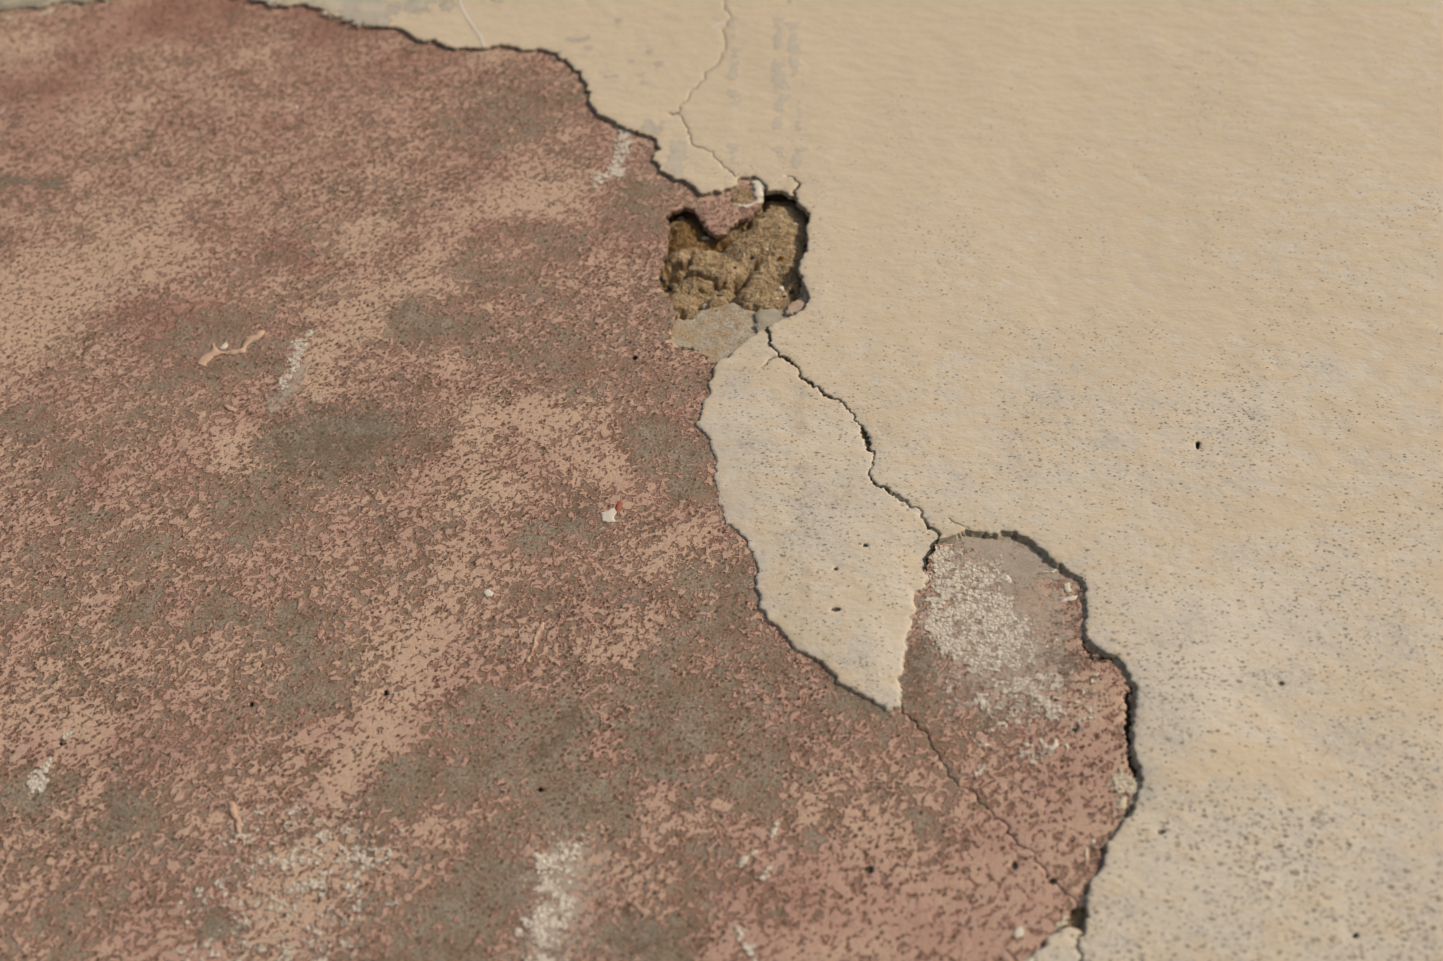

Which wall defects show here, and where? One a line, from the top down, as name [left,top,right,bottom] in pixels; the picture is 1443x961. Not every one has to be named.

flaking render [0,0,1140,961]
crack [766,326,940,572]
damp [920,537,1077,721]